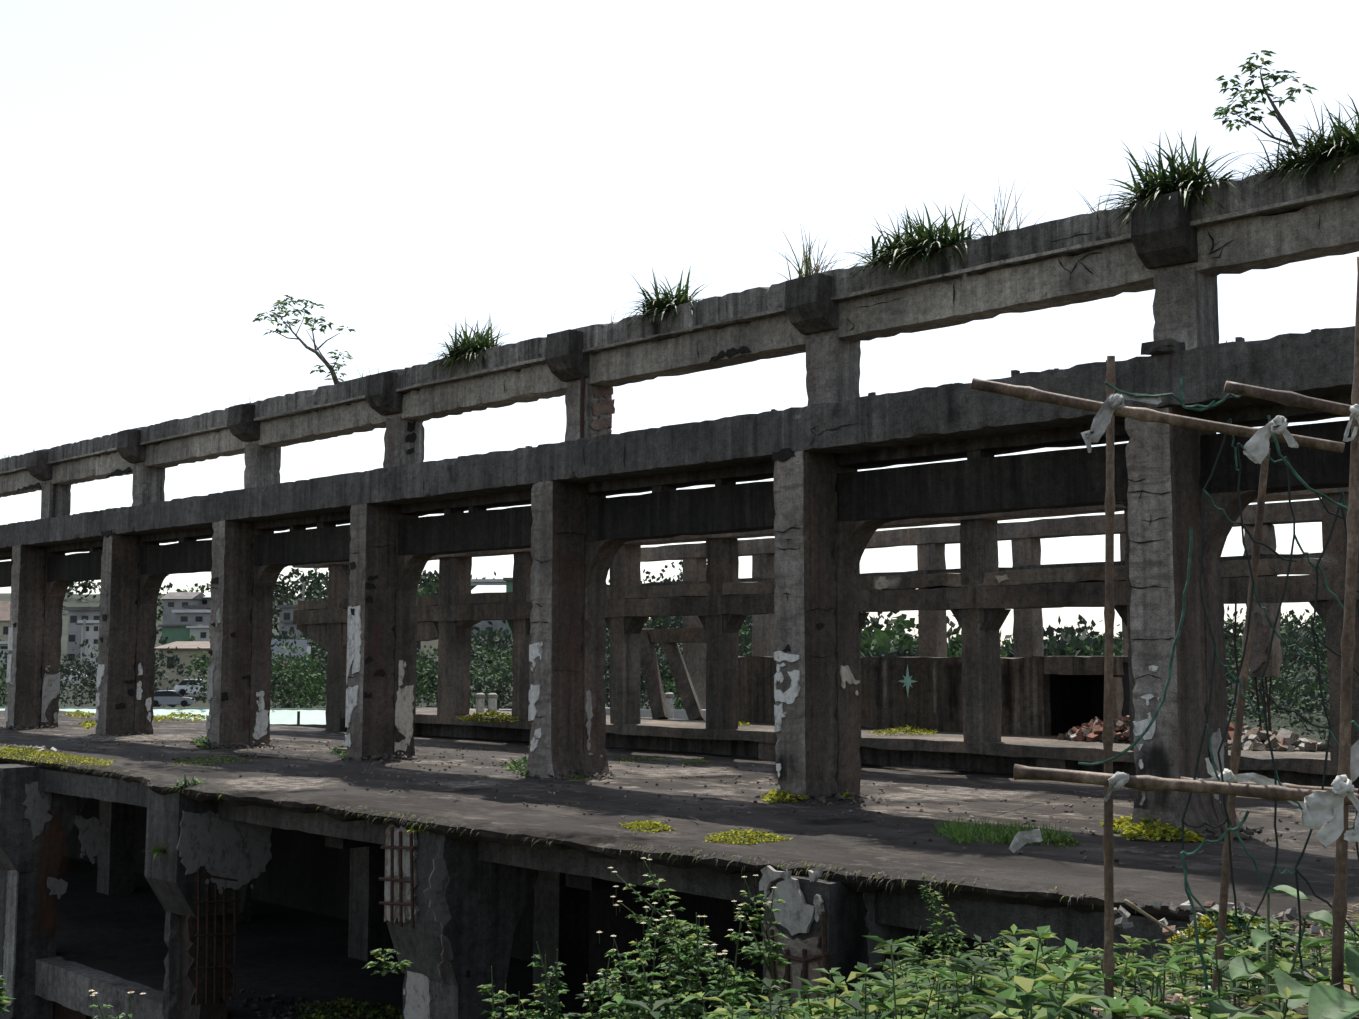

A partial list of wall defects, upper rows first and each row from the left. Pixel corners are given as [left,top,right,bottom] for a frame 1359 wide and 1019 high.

peeling [206,650,228,732]
peeling [242,675,269,743]
peeling [345,575,414,755]
peeling [528,642,543,752]
peeling [774,644,801,732]
flaking render [23,782,53,840]
flaking render [46,877,68,899]
flaking render [75,815,110,864]
flaking render [176,810,272,894]
spalling [379,825,453,1019]
spalling [759,865,830,1017]